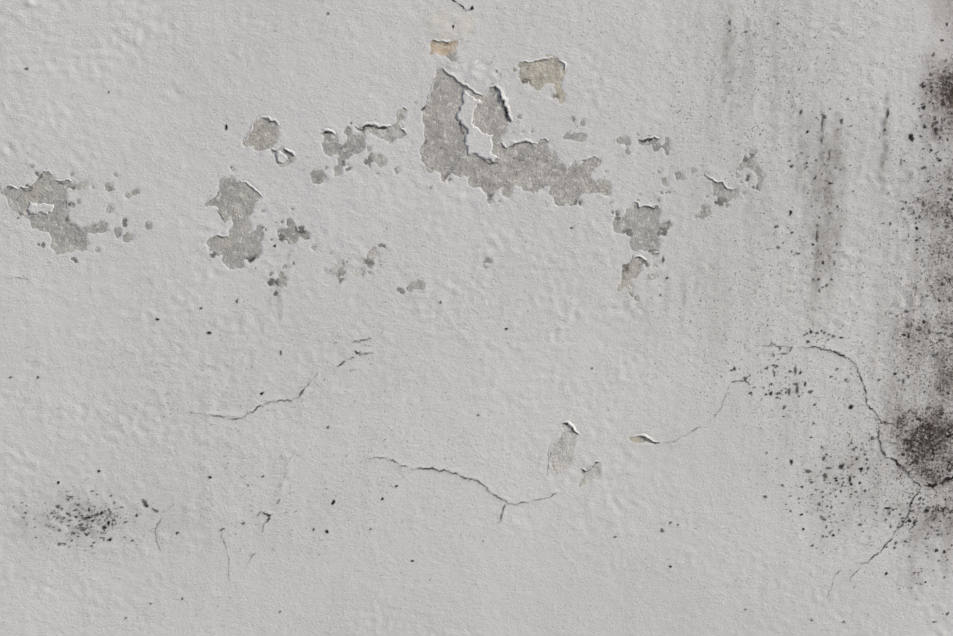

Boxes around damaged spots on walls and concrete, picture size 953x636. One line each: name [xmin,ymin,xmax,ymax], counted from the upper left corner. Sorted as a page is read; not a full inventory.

peeling [0,163,140,263]
peeling [202,166,316,269]
peeling [243,115,297,167]
peeling [310,38,764,301]
leakage [883,53,953,265]
peeling [267,264,288,296]
leakage [12,481,127,551]
crack [372,457,525,519]
peeling [547,420,602,487]
leakage [721,342,816,417]
crack [777,346,953,559]
leakage [782,272,953,578]